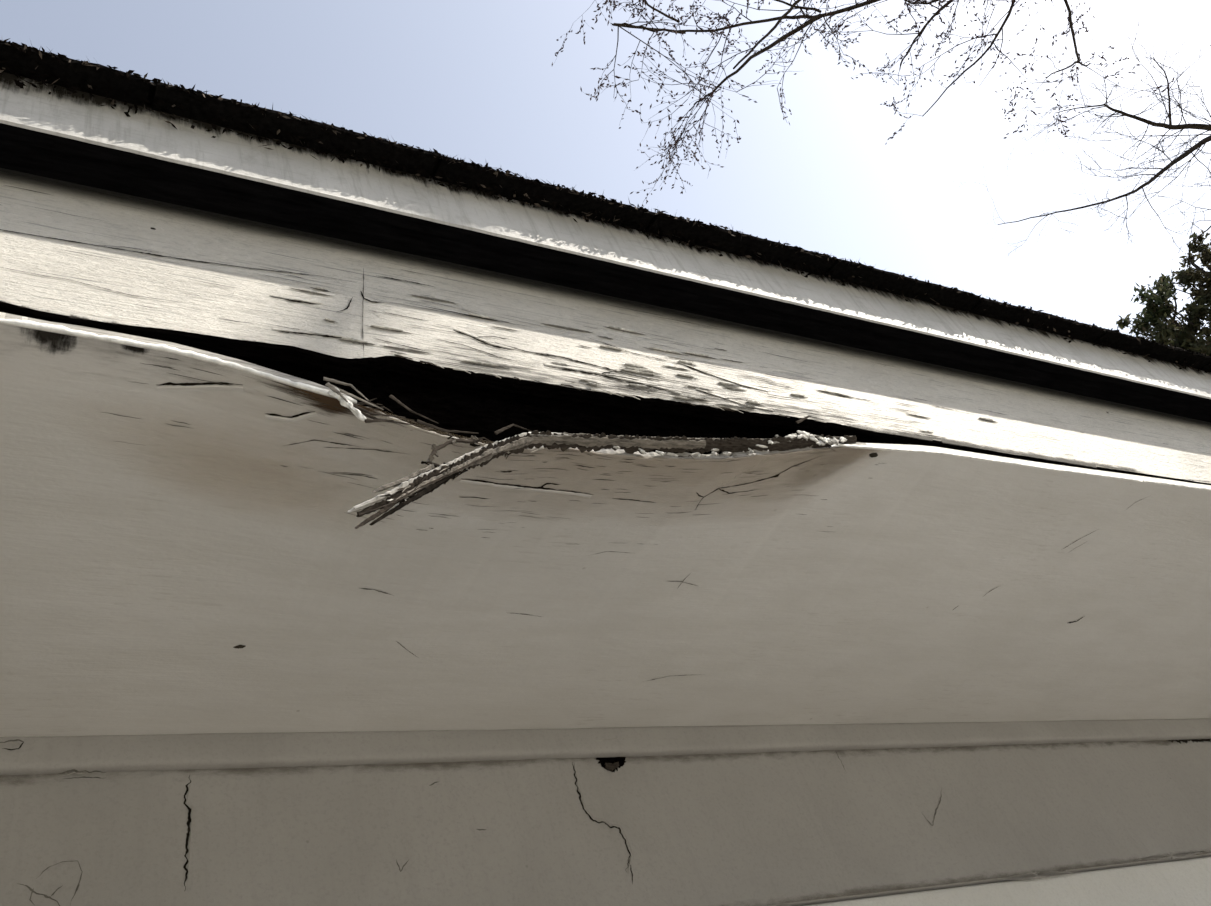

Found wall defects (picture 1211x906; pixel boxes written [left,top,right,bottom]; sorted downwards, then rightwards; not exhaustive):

spalling [325,382,367,421]
peeling [338,323,933,456]
crack [1169,737,1211,745]
crack [21,861,82,906]
crack [183,775,196,891]
crack [572,762,634,884]